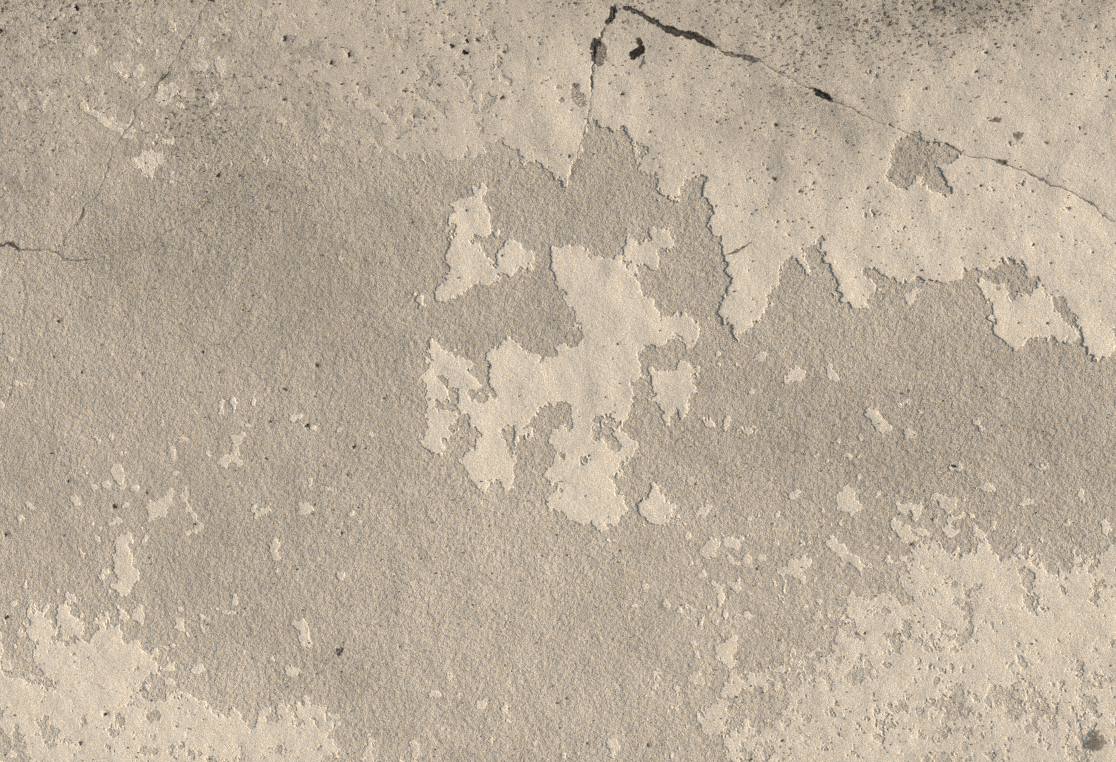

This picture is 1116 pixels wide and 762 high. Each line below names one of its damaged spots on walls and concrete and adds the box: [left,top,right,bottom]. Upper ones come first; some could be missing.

crack [0,0,213,426]
peeling [37,4,235,184]
peeling [254,0,1116,377]
crack [565,4,1116,222]
peeling [0,433,353,762]
peeling [178,397,237,424]
peeling [205,423,251,469]
peeling [288,414,316,431]
peeling [417,225,1116,762]